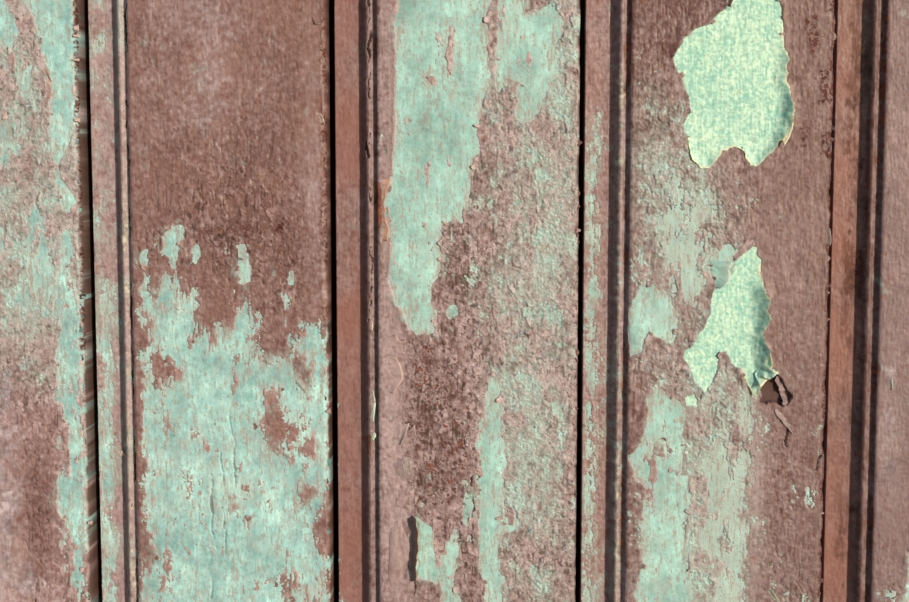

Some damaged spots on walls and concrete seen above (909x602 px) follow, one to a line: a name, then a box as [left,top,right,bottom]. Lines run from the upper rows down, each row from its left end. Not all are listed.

peeling [0,0,82,213]
peeling [93,30,105,53]
peeling [380,0,564,335]
peeling [673,0,795,169]
peeling [23,202,125,602]
peeling [131,225,344,602]
peeling [628,166,793,602]
peeling [883,545,909,602]